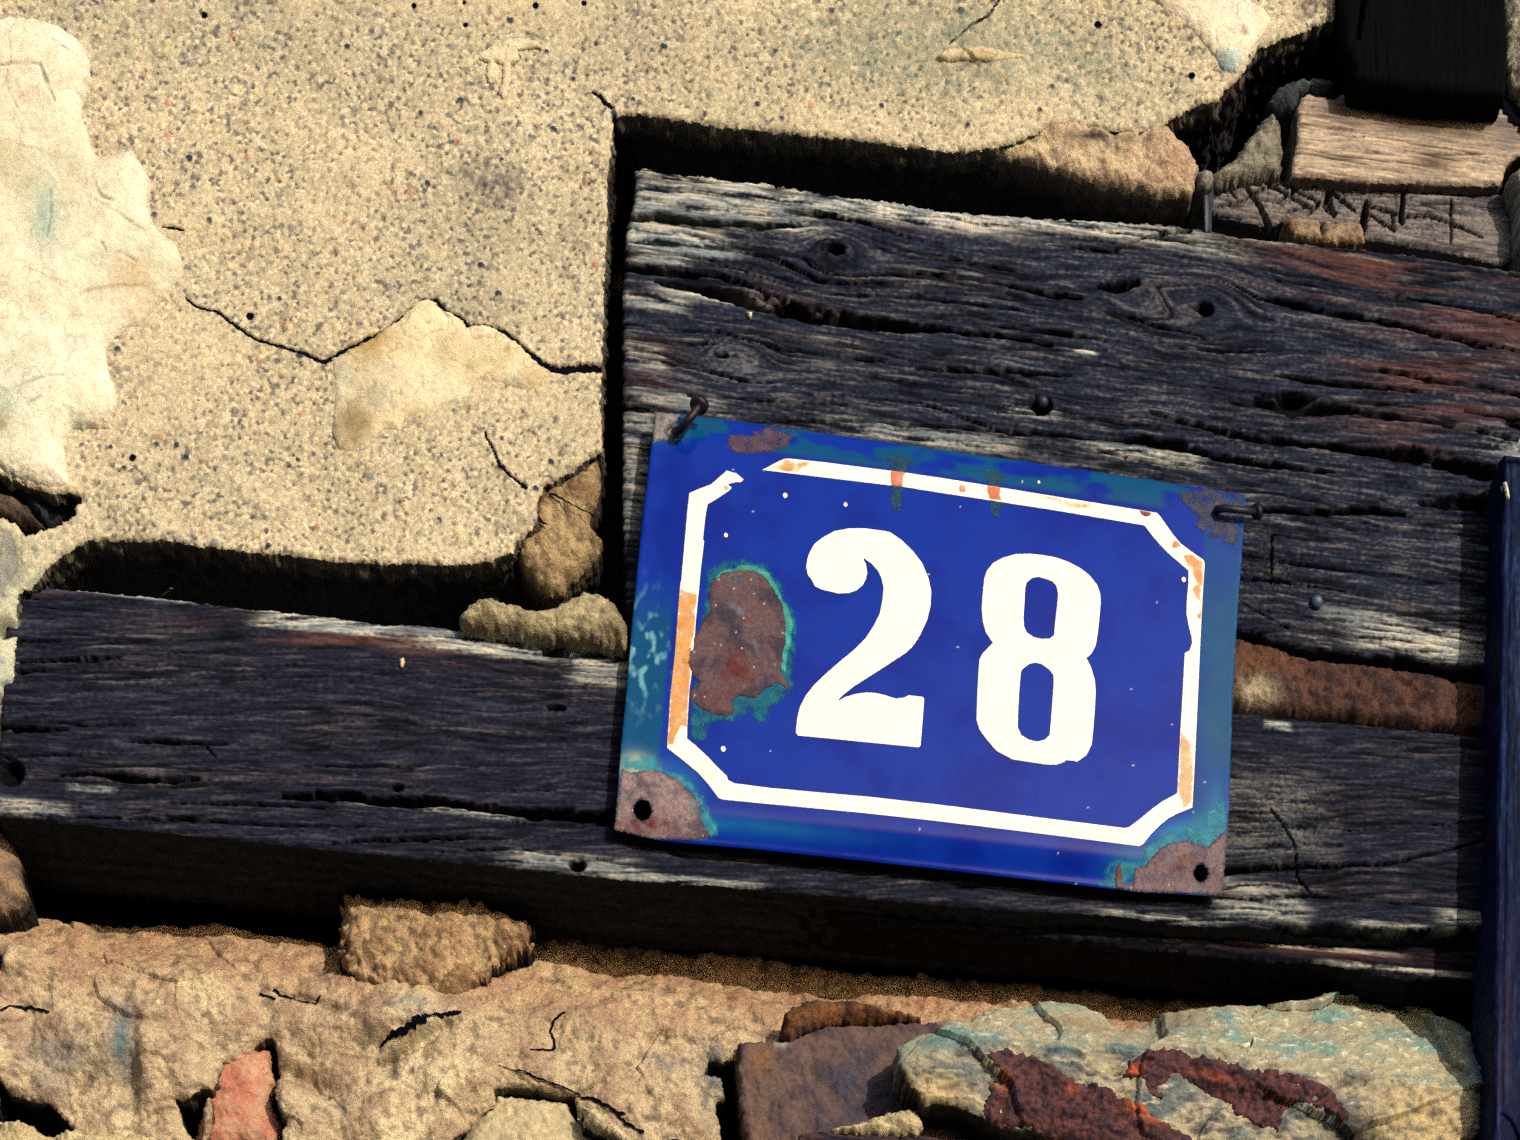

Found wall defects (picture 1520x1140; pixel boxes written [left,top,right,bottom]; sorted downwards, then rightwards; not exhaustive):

crack [186,298,603,375]
peeling [581,1106,642,1140]
corrosion [983,1047,1349,1140]